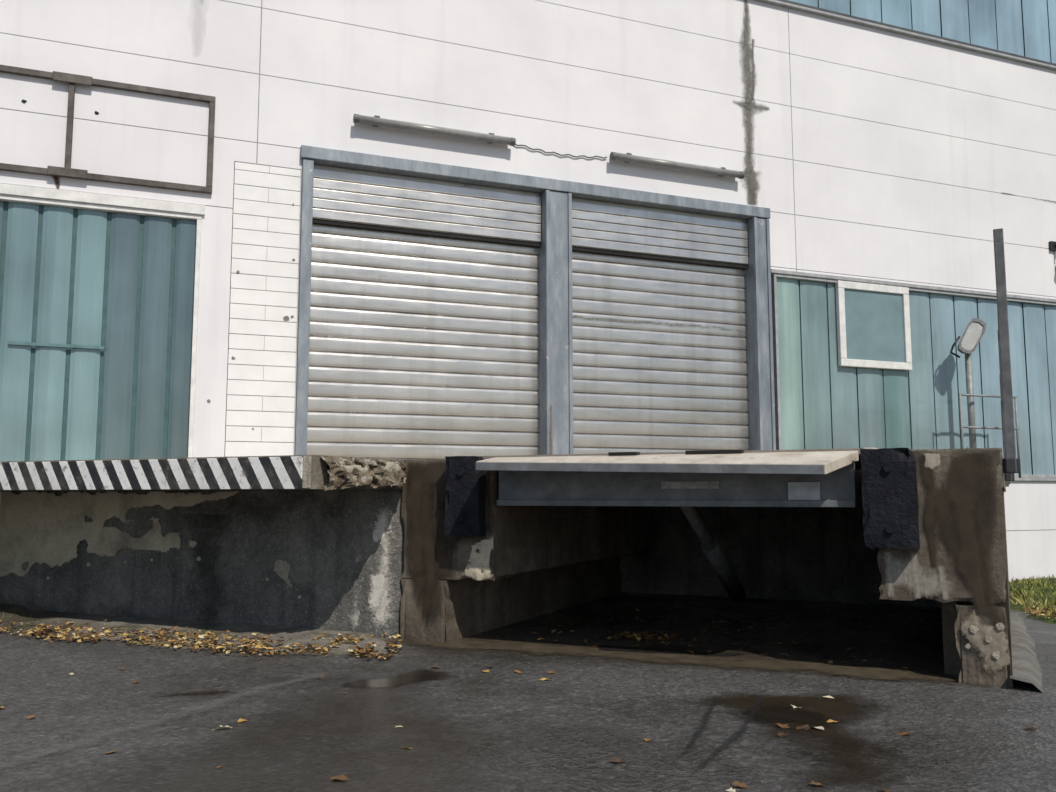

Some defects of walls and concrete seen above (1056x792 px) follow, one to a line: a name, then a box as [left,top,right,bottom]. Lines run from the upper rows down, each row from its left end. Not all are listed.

spalling [321,456,408,491]
flaking render [0,491,239,580]
damp [350,509,392,627]
damp [406,462,494,621]
spalling [463,537,493,580]
damp [884,452,1007,633]
spalling [961,610,1010,673]